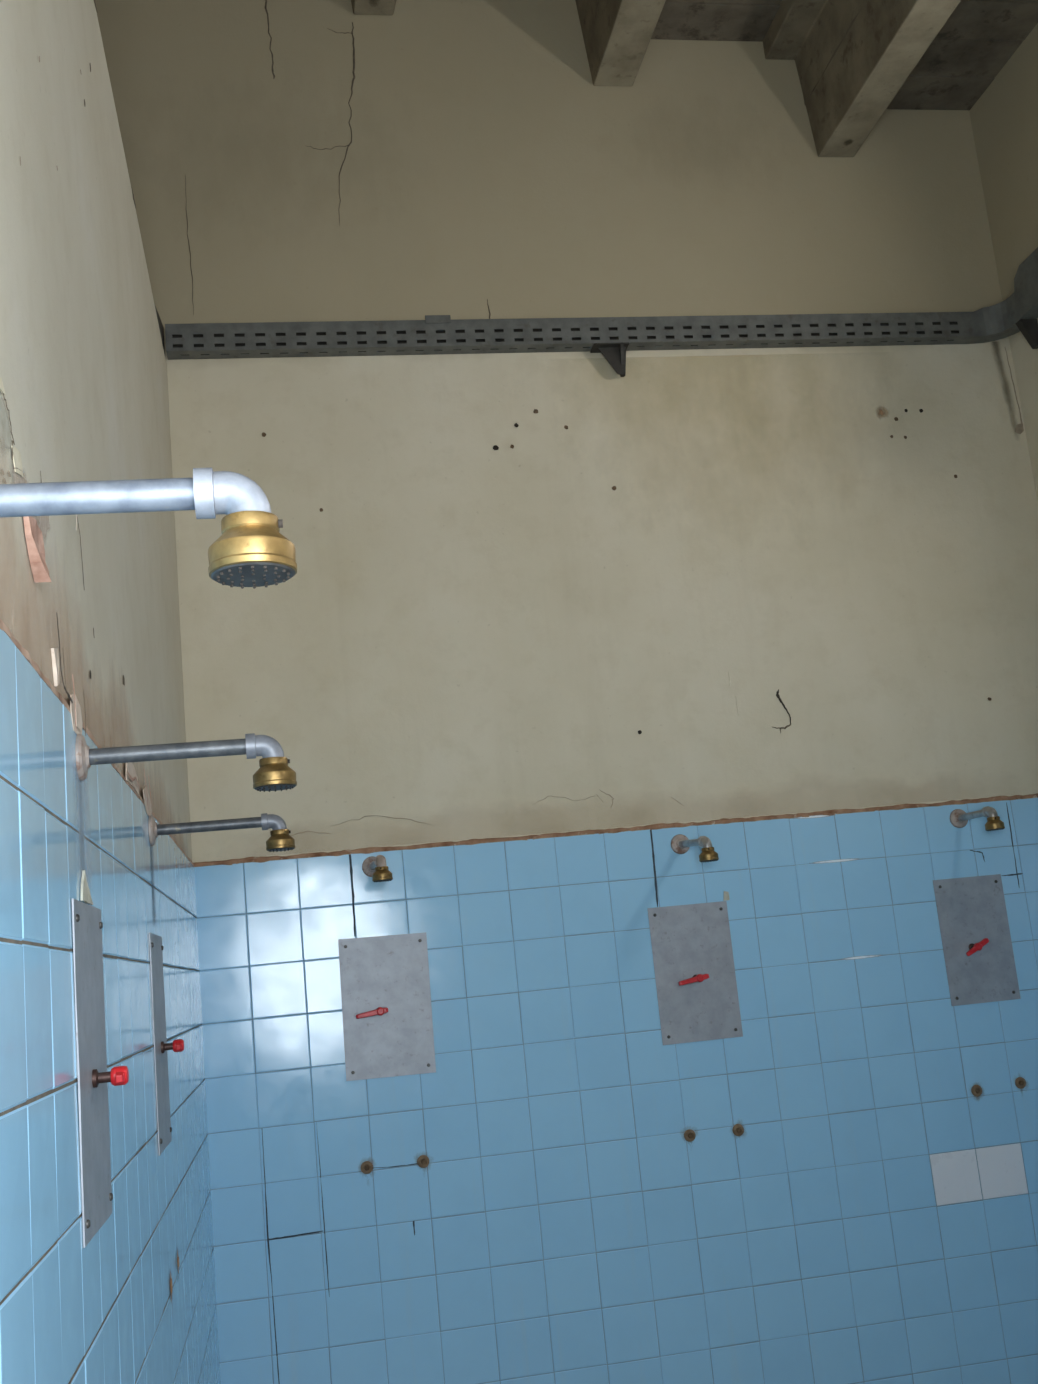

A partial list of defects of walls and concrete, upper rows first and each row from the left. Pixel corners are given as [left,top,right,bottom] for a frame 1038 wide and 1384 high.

crack [265,0,275,79]
crack [307,22,355,226]
spalling [0,377,42,484]